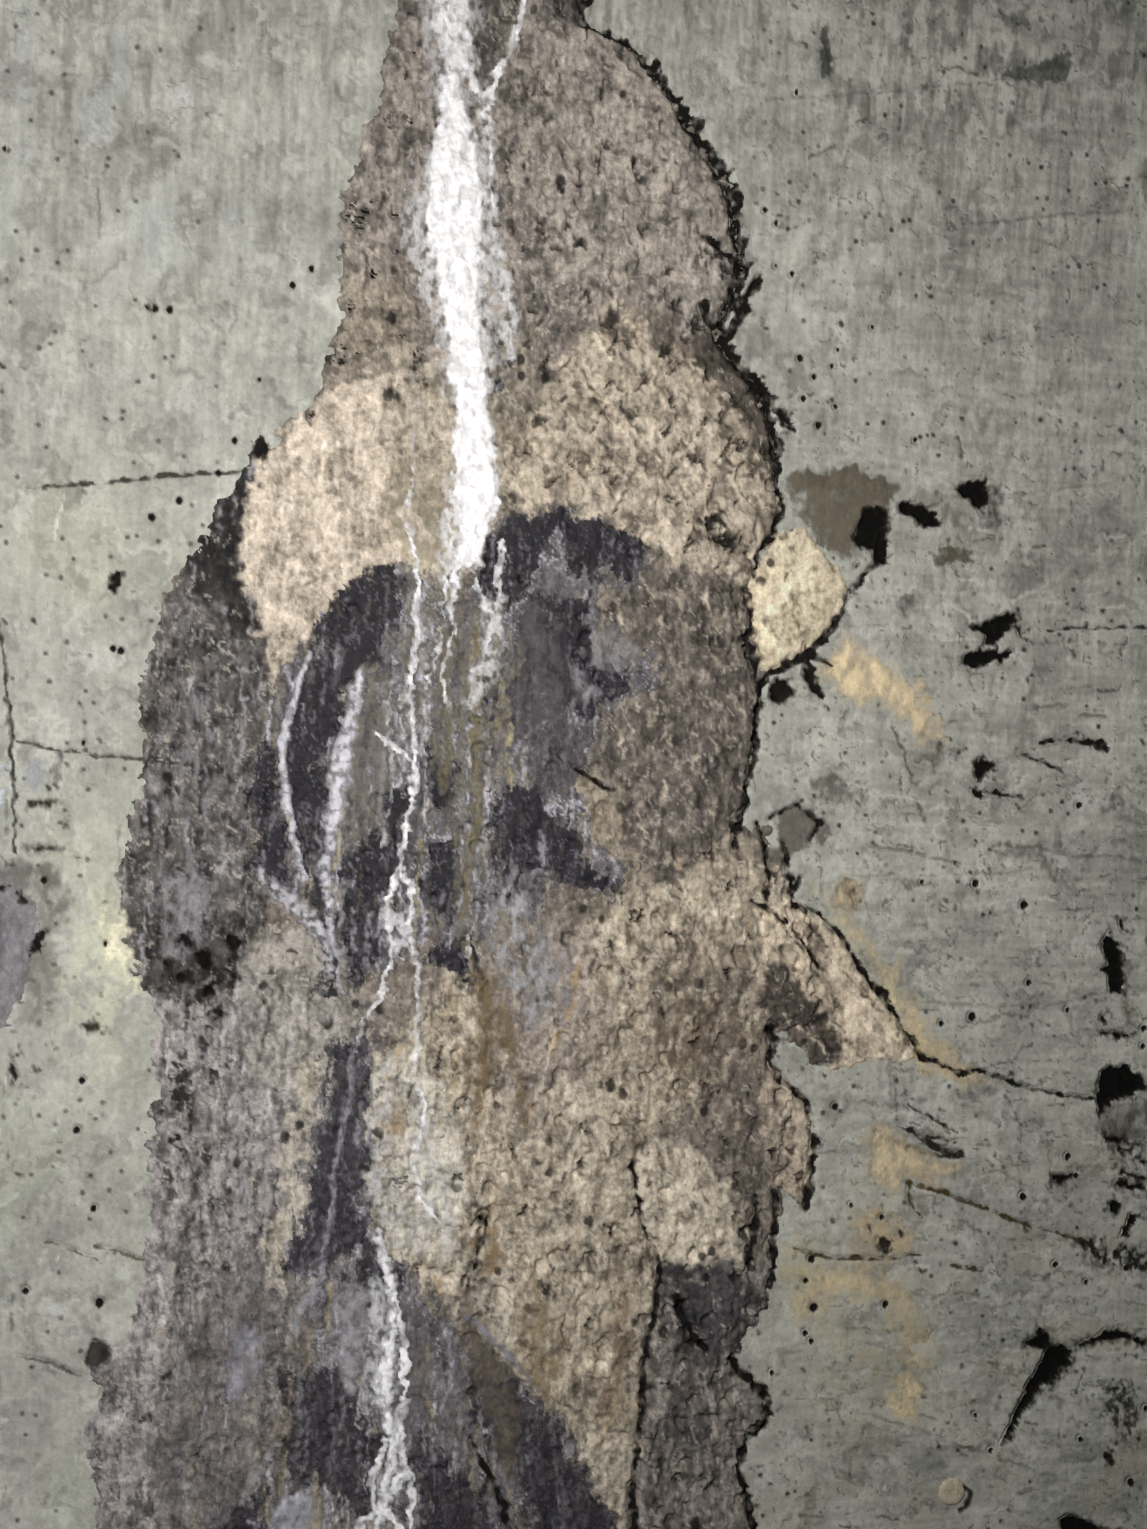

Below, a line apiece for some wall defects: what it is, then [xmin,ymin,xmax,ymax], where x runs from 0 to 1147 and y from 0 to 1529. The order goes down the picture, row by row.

spalling [820,27,832,77]
spalling [253,437,268,459]
spalling [108,570,125,593]
crack [577,0,1095,1100]
peeling [744,463,973,705]
leakage [149,0,662,1529]
crack [570,764,615,791]
crack [1024,737,1109,772]
hole [163,932,241,1017]
peeling [759,890,917,1071]
peeling [758,1062,816,1204]
hole [85,1341,110,1367]